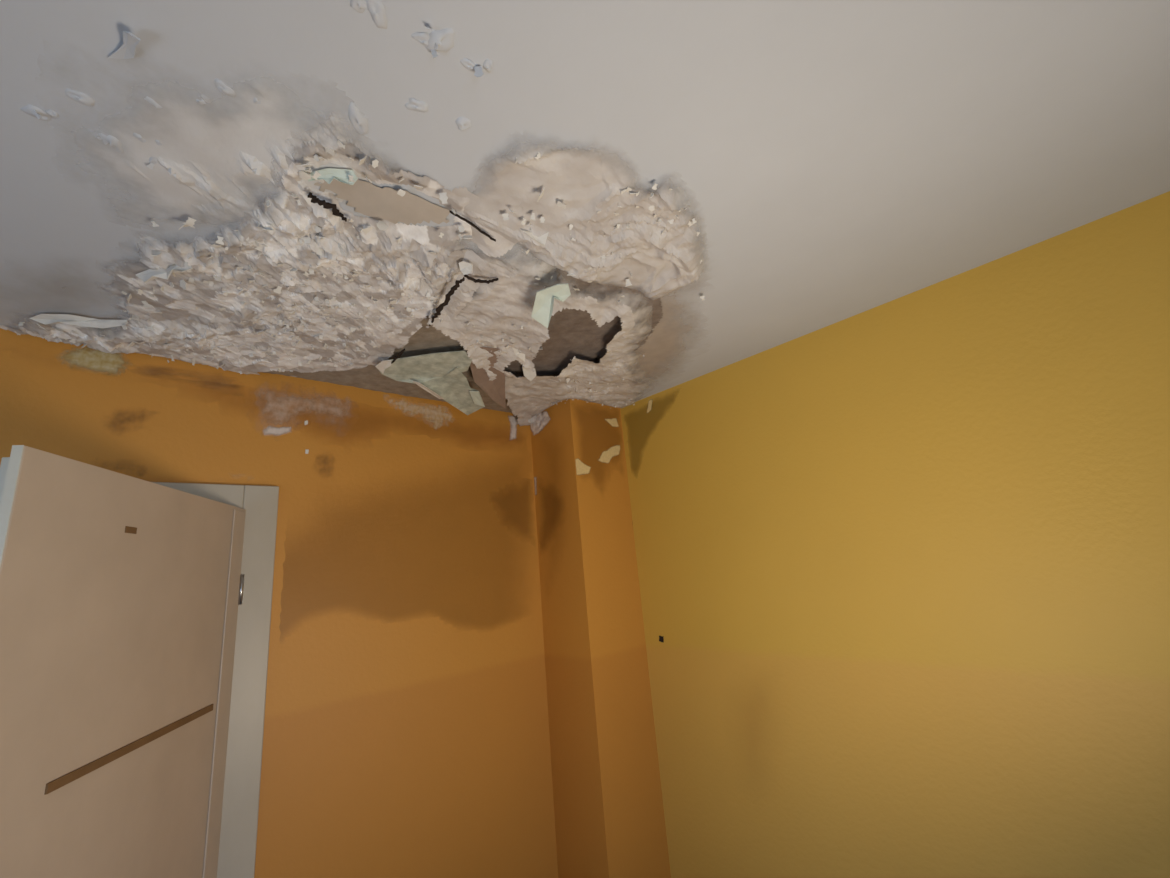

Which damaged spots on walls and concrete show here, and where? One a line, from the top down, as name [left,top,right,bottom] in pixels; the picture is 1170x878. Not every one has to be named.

crack [449,210,496,242]
peeling [604,183,700,236]
peeling [0,126,664,439]
crack [429,275,498,326]
peeling [575,445,620,475]